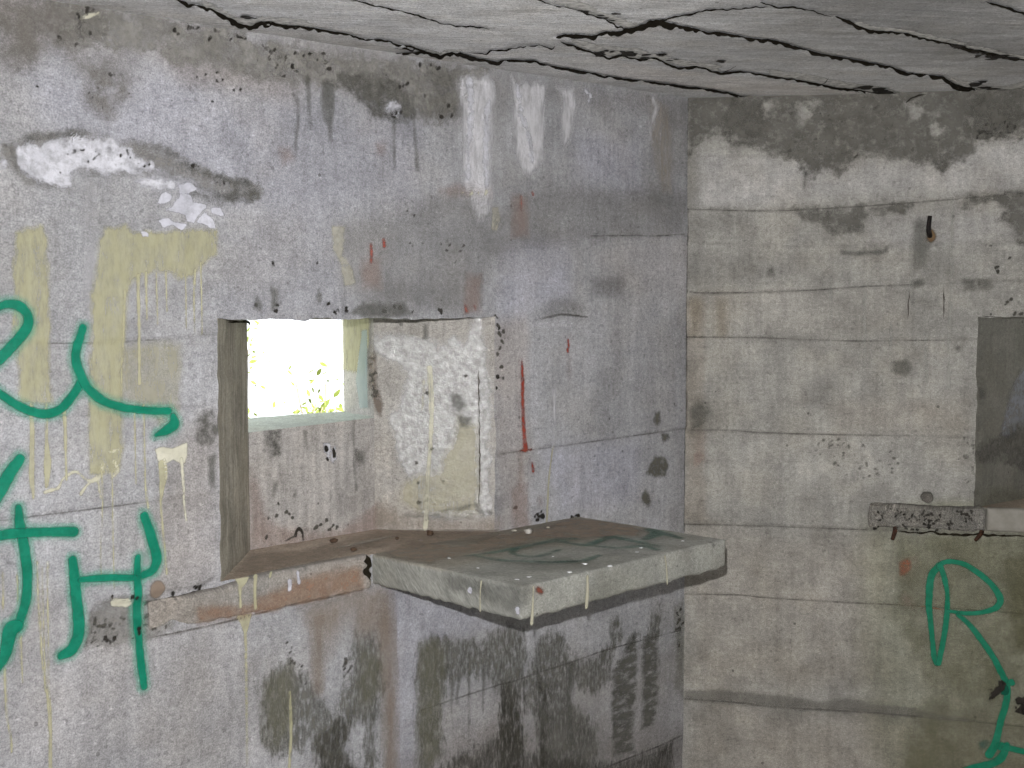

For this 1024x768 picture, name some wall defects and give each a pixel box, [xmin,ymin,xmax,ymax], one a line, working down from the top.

water stain [1,133,175,189]
peeling [5,129,260,230]
water stain [323,72,415,123]
water stain [440,76,495,221]
water stain [513,82,545,174]
water stain [560,89,592,143]
crack [177,0,1024,103]
water stain [796,203,866,233]
water stain [688,88,1024,177]
water stain [965,192,1024,244]
water stain [261,632,385,768]
water stain [415,615,673,768]